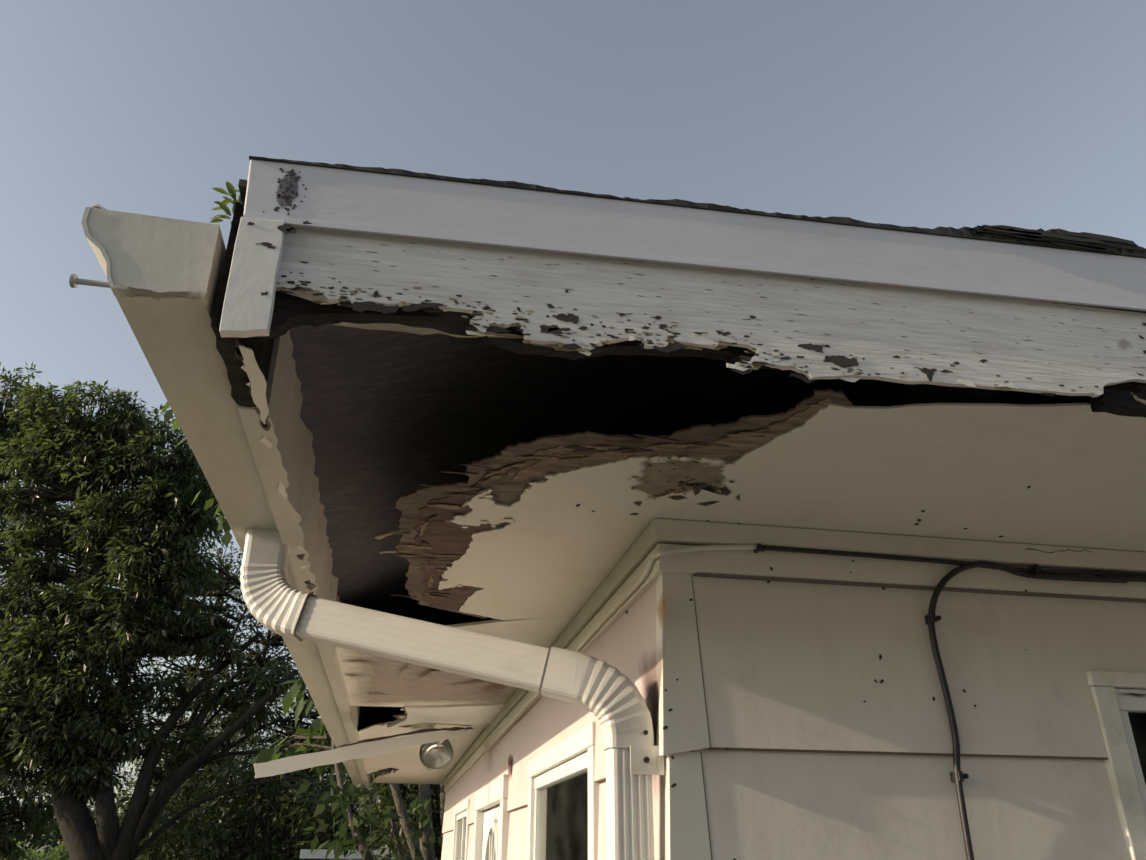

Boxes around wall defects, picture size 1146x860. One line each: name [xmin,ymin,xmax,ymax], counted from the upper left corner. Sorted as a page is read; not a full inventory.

peeling [277,221,312,234]
peeling [261,261,976,387]
peeling [994,375,1033,391]
peeling [1126,322,1146,394]